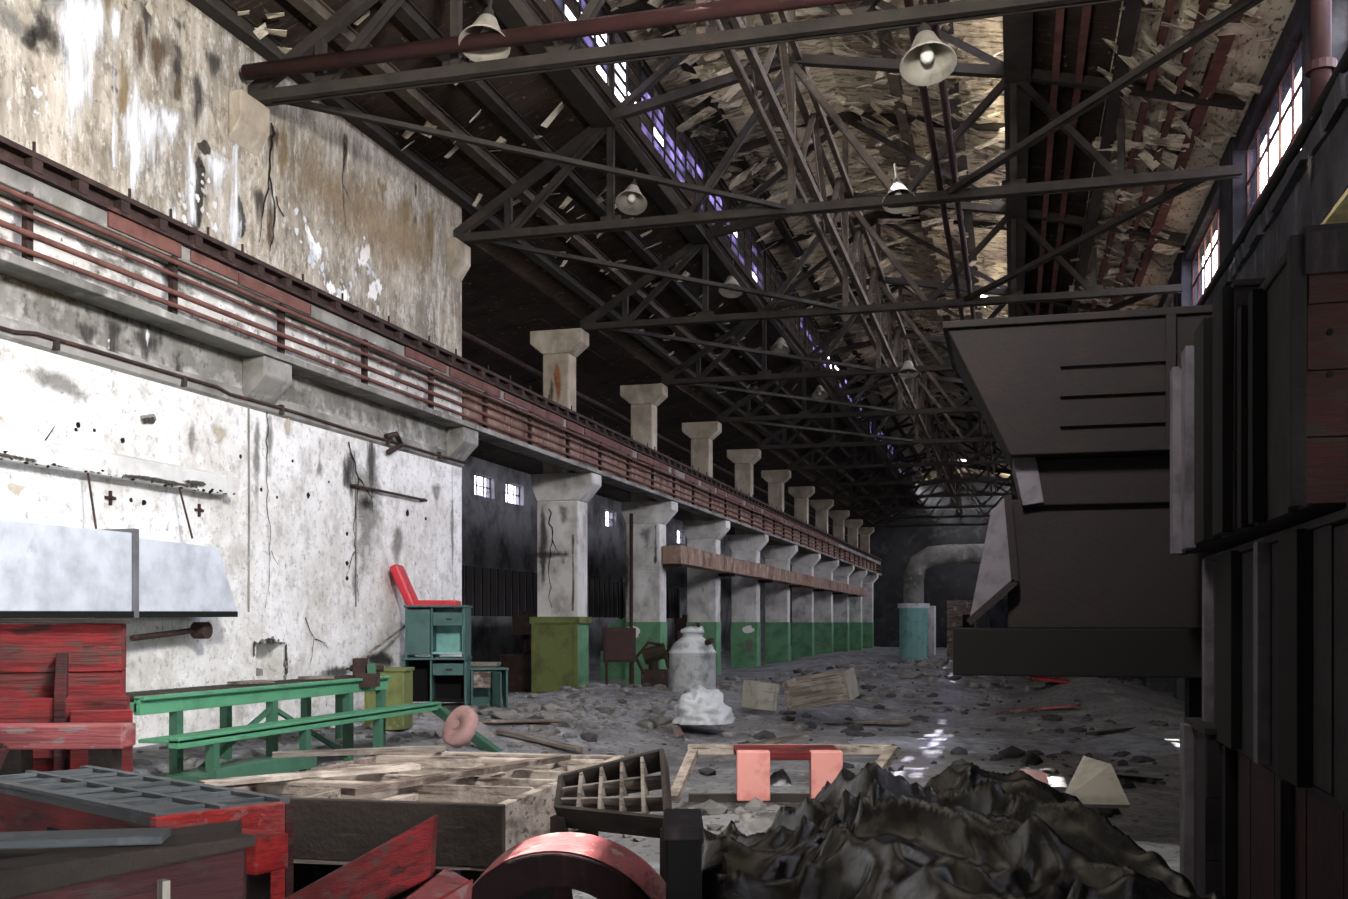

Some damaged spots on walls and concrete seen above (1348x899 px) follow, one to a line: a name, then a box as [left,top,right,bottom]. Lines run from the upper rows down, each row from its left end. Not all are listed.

damp [2,0,123,127]
damp [112,4,274,244]
damp [268,119,287,176]
peeling [294,208,384,312]
damp [347,442,376,493]